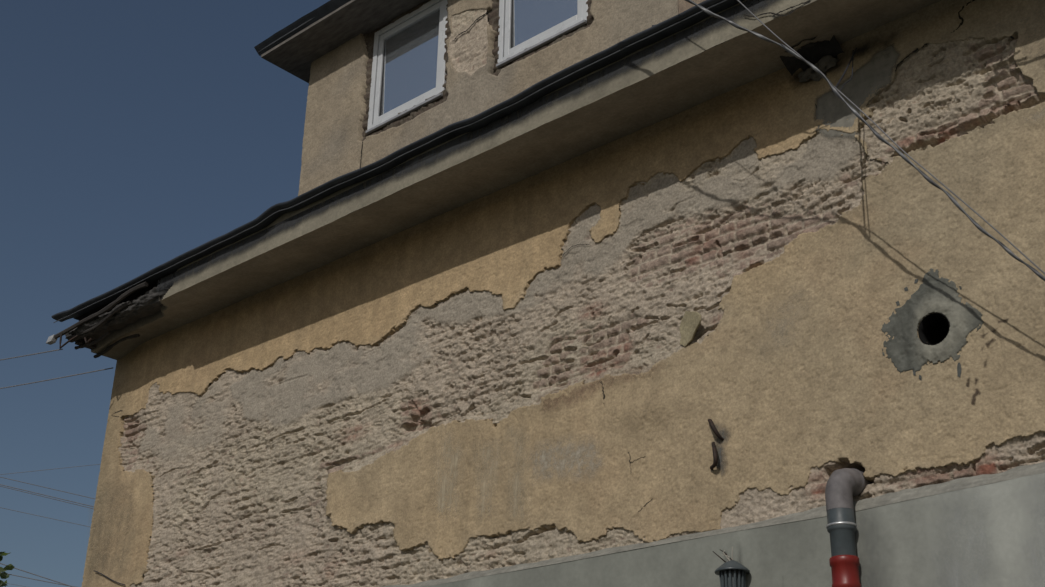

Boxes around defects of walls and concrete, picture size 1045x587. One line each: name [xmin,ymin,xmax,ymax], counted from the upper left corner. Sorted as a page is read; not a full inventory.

spalling [362,0,594,142]
spalling [780,35,844,83]
flaking render [837,45,900,114]
spalling [857,37,1045,164]
spalling [46,282,171,358]
spalling [118,90,894,587]
spalling [720,432,1045,529]